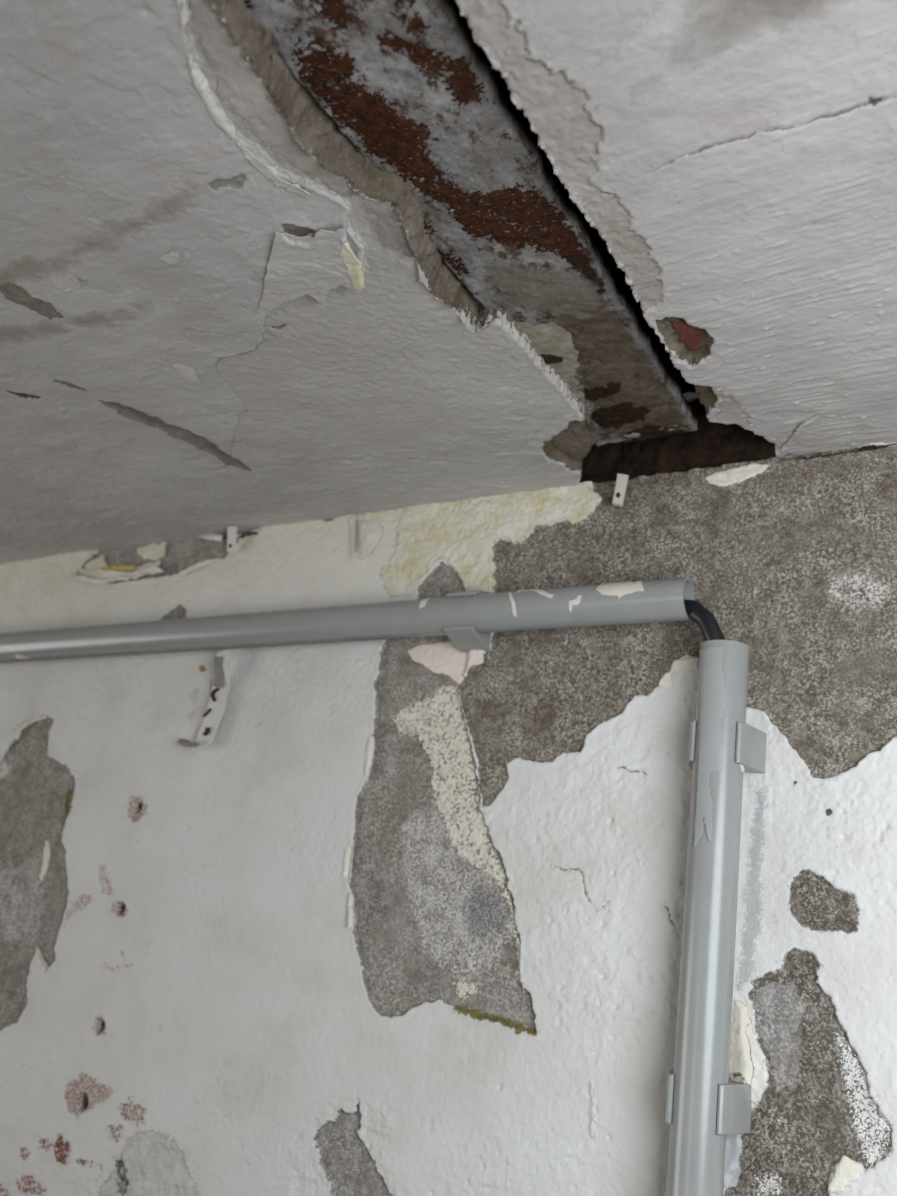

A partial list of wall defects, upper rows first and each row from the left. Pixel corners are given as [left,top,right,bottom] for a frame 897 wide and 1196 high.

rust [291,0,690,442]
crack [671,96,897,163]
spalling [75,0,897,779]
spalling [0,714,75,1031]
spalling [343,620,705,1036]
spalling [787,868,860,934]
spalling [313,1103,392,1196]
spalling [723,947,896,1196]